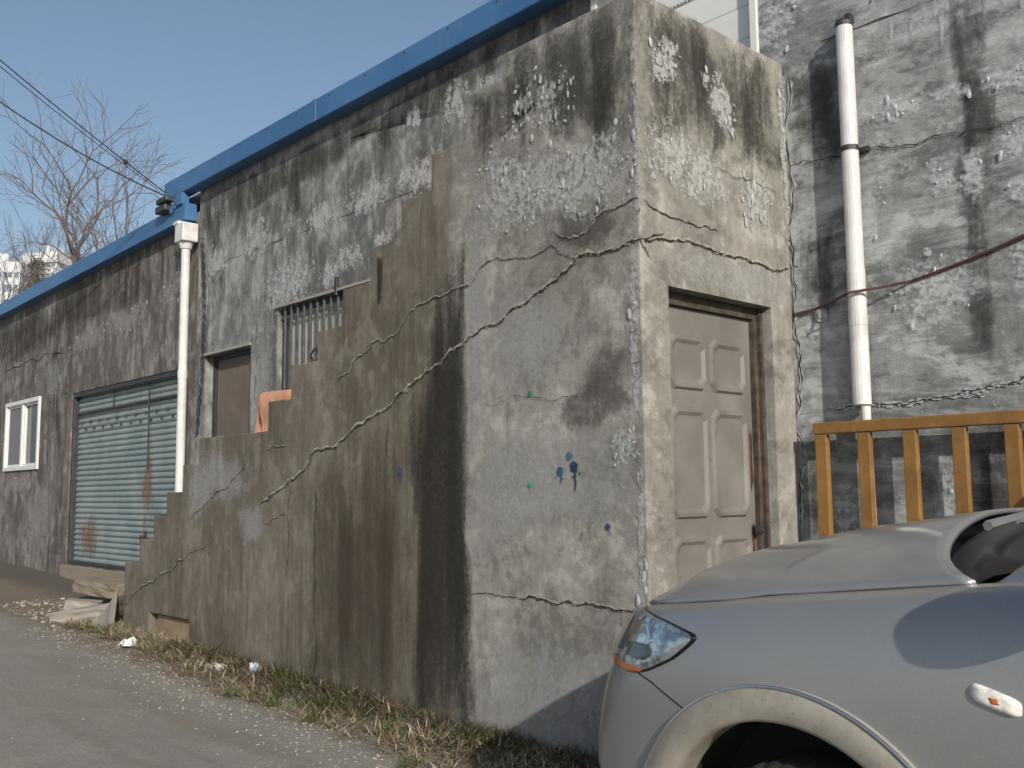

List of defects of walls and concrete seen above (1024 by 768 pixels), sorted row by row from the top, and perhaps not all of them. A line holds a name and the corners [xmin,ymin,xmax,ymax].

water stain [204,25,623,257]
water stain [652,14,781,161]
water stain [889,0,994,159]
crack [870,117,1023,149]
crack [261,70,841,677]
water stain [565,352,624,424]
crack [835,374,1024,412]
corrosion [139,461,151,551]
water stain [410,237,557,725]